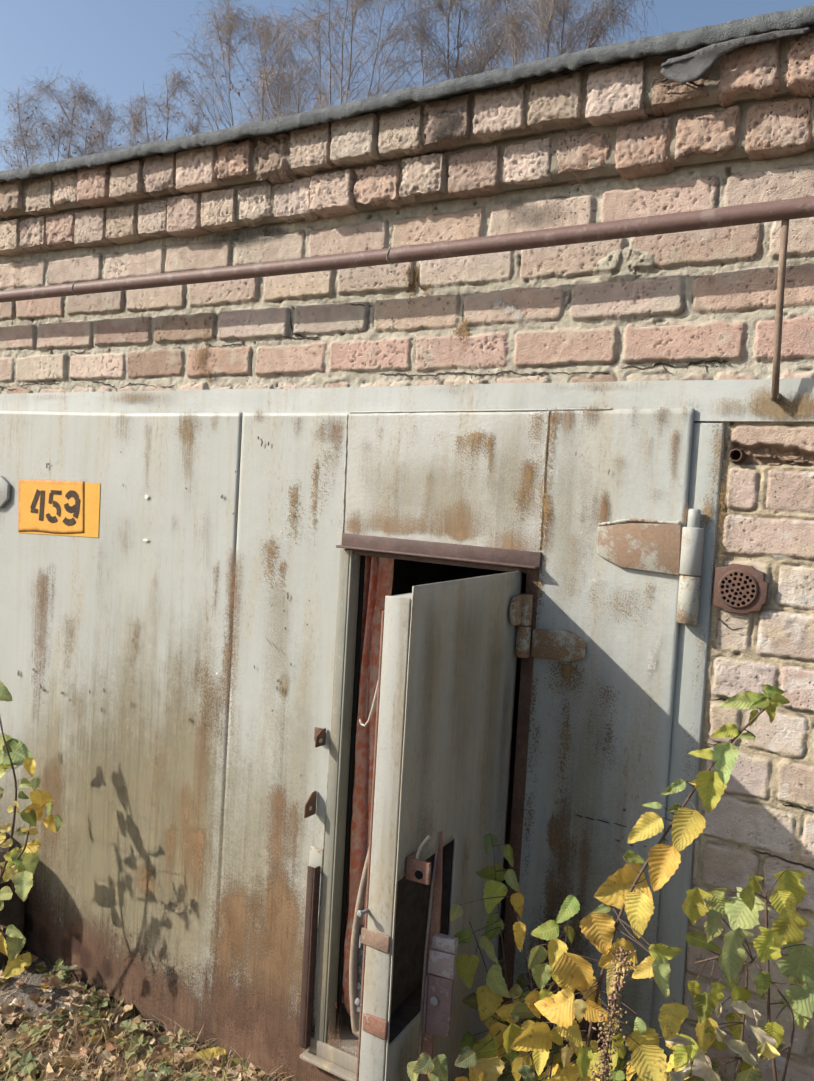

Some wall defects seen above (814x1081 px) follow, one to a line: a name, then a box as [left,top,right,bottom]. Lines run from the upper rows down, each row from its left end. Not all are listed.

crack [381,360,728,386]
rust [752,390,814,419]
rust [452,430,496,480]
rust [260,423,342,592]
rust [348,504,478,540]
rust [516,407,598,619]
rust [593,494,609,523]
rust [701,424,729,568]
rust [23,558,352,1081]
rust [544,662,619,954]
rust [516,937,562,994]
rust [574,1017,604,1049]